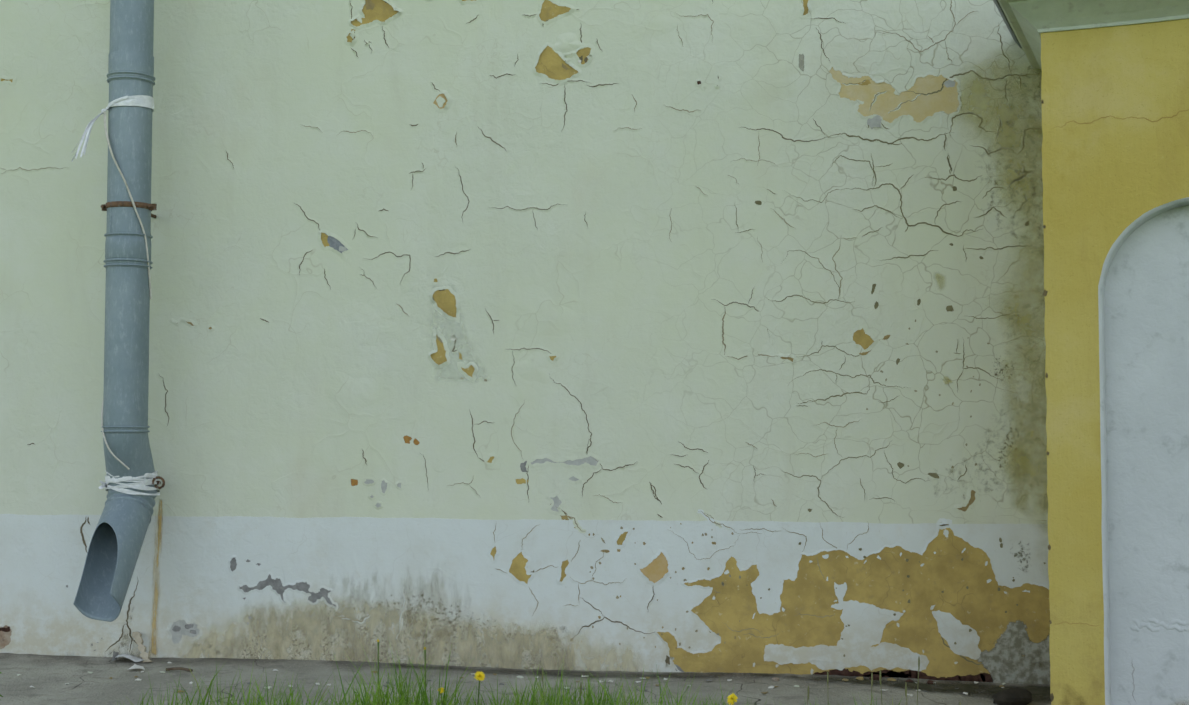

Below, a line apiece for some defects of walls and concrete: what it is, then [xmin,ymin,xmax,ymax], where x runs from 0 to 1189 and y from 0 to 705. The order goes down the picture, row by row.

peeling [343,0,404,59]
peeling [522,0,605,132]
peeling [798,0,962,130]
peeling [427,279,487,382]
crack [418,0,1189,642]
flaking render [228,555,339,612]
leakage [244,589,721,677]
peeling [487,492,635,618]
peeling [634,486,1052,678]